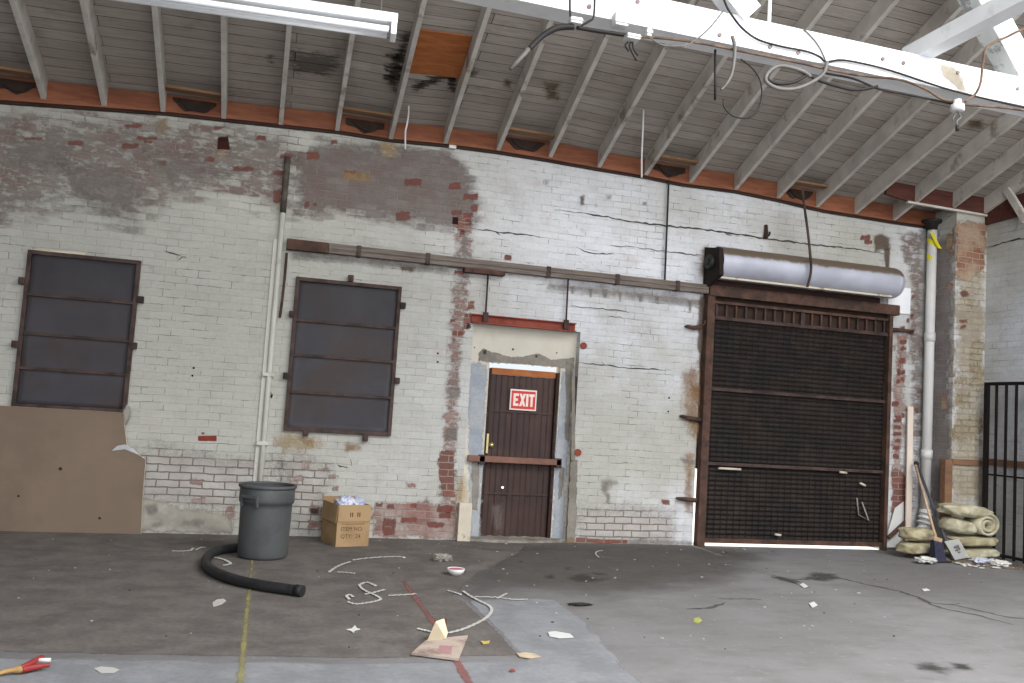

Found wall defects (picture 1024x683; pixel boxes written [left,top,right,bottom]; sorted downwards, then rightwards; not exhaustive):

leakage [384,32,410,90]
leakage [413,76,456,92]
crack [471,228,539,237]
crack [562,210,884,256]
peeling [0,112,694,545]
crack [579,362,659,370]
rust [685,297,704,430]
peeling [891,220,987,527]
rust [682,455,692,510]